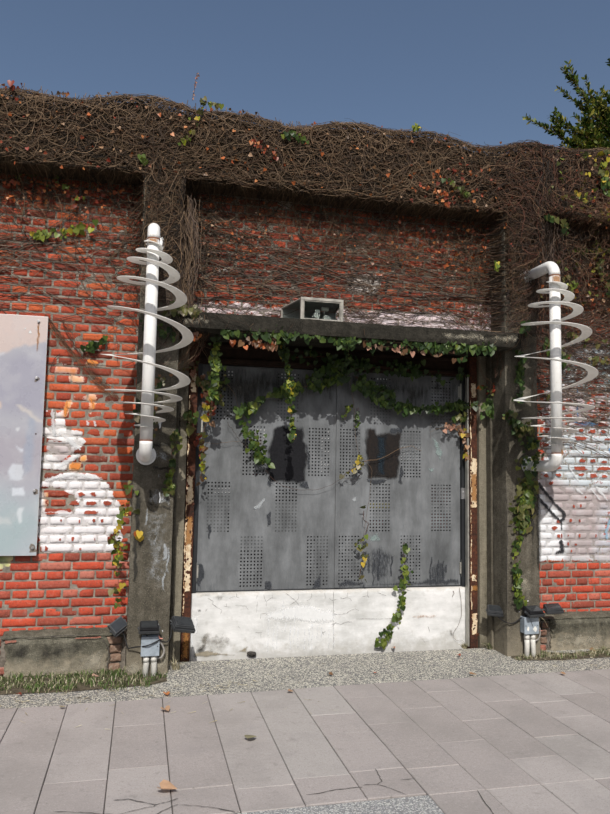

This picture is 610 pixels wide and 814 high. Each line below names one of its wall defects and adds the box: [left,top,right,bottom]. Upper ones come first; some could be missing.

peeling [562,400,610,440]
peeling [574,458,610,478]
peeling [39,491,112,523]
crack [208,592,386,647]